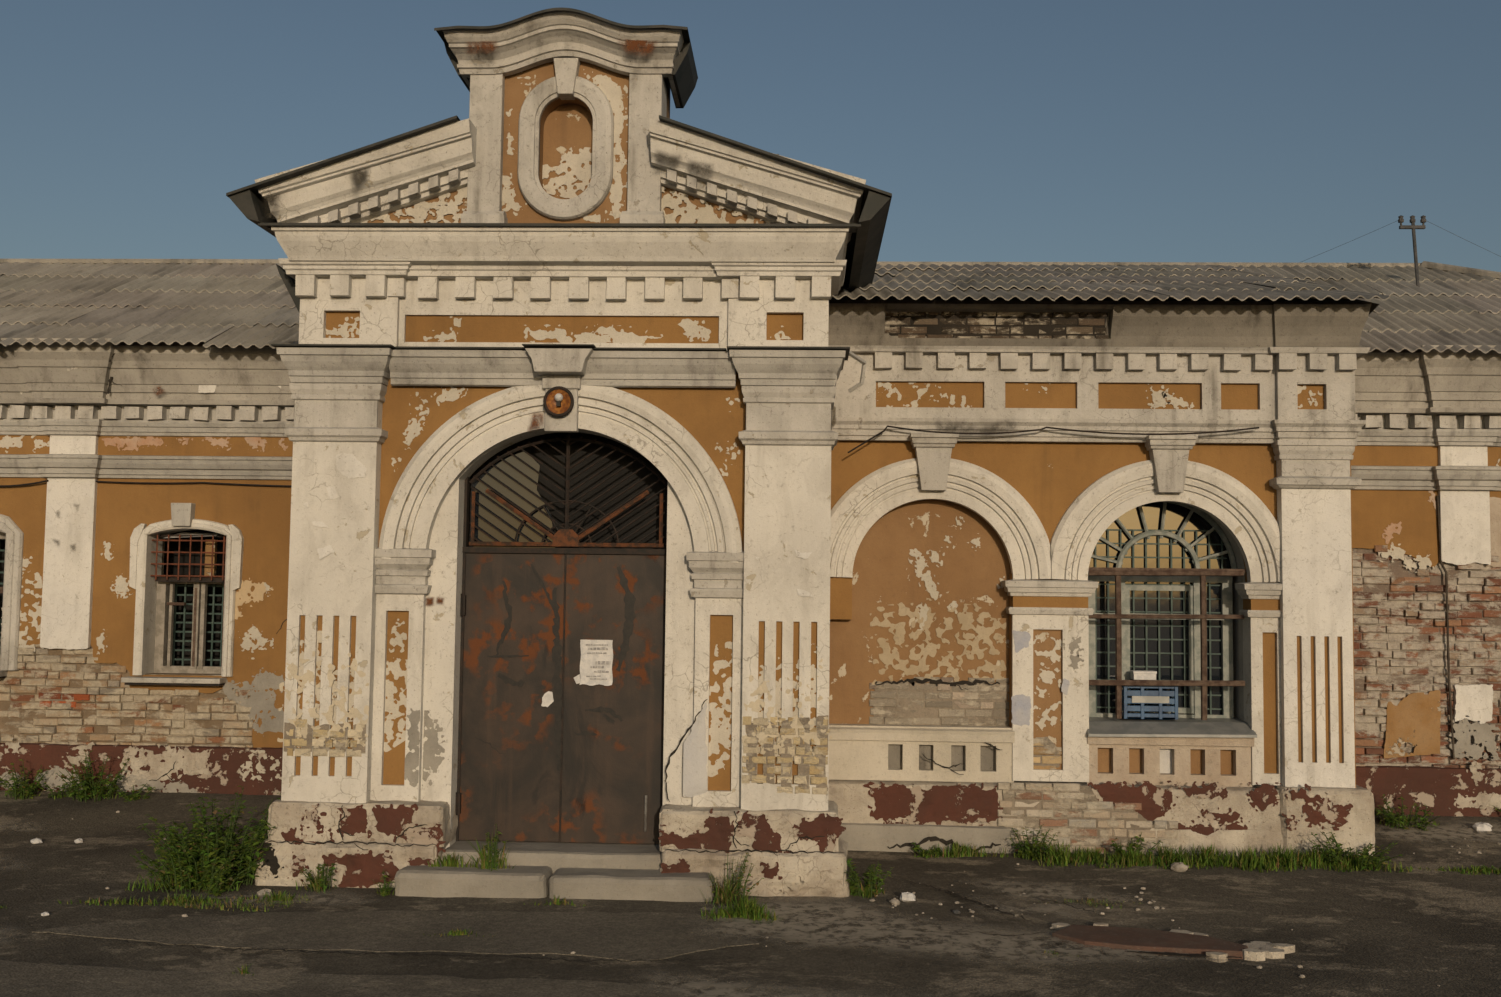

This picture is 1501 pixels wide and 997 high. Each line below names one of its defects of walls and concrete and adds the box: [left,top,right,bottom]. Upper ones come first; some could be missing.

peeling [542,146,592,199]
peeling [524,324,663,343]
peeling [678,319,711,342]
peeling [0,435,50,453]
peeling [102,436,288,452]
peeling [101,541,133,599]
flaking render [869,516,1009,726]
crack [876,678,1000,690]
flaking render [0,556,446,888]
flaking render [708,641,832,794]
flaking render [863,636,1353,855]
peeling [658,808,846,883]